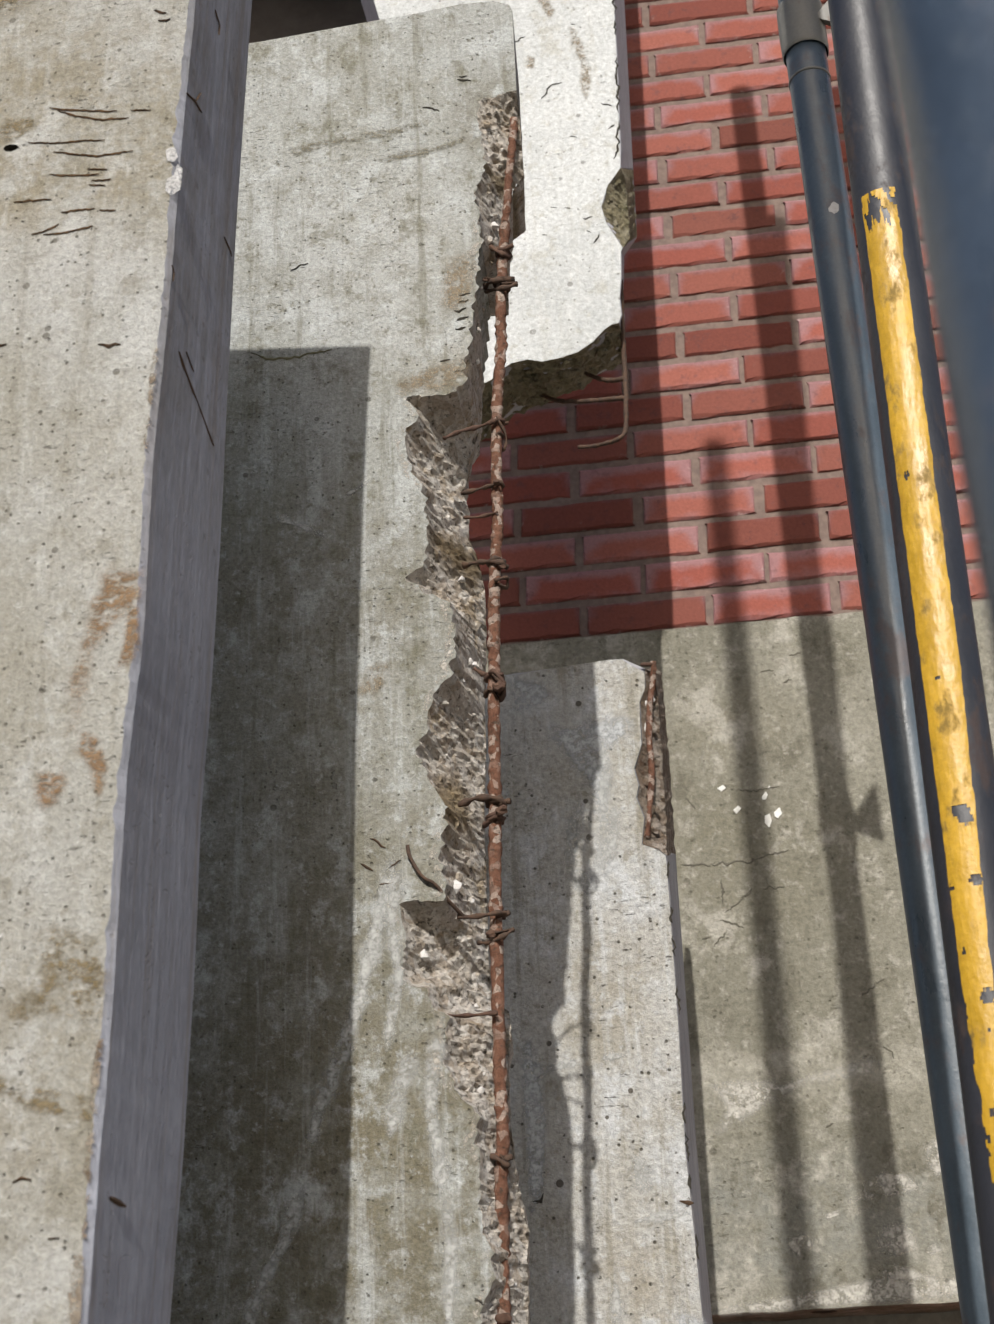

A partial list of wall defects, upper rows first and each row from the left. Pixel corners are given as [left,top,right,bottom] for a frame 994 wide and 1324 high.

spalling [602,168,637,247]
corrosion [74,572,138,683]
spalling [395,90,622,1324]
corrosion [36,773,64,804]
corrosion [79,734,106,790]